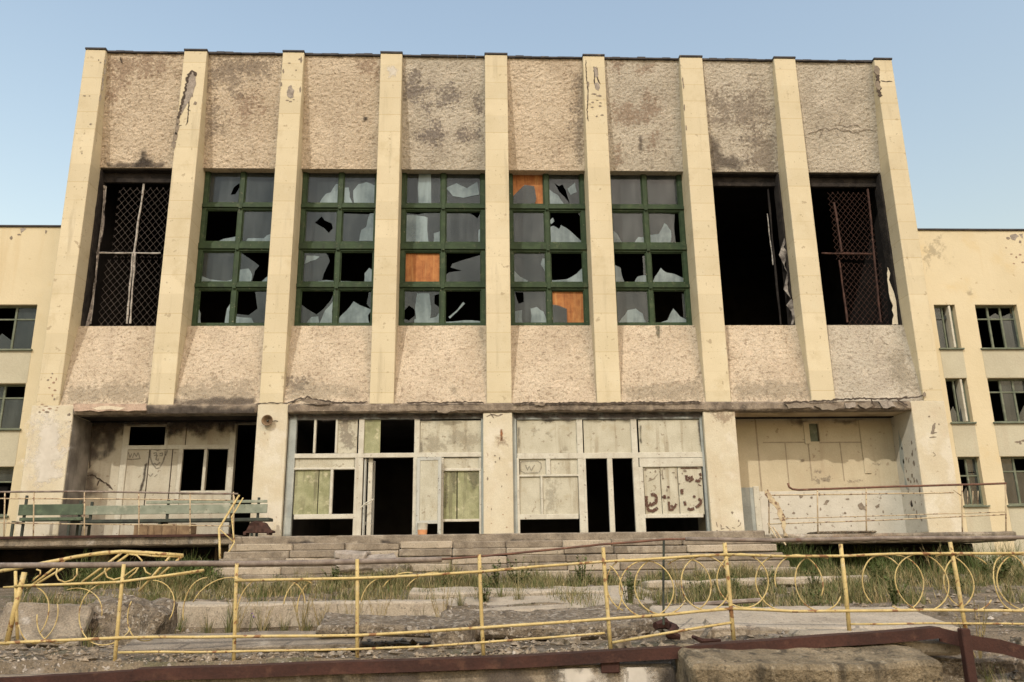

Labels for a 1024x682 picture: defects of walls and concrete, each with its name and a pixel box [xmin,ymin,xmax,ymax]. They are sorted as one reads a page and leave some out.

spalling [171,70,197,149]
water stain [403,69,461,147]
water stain [457,92,484,142]
spalling [591,66,604,117]
crack [808,118,875,137]
spalling [783,396,908,410]
peeling [898,431,922,521]